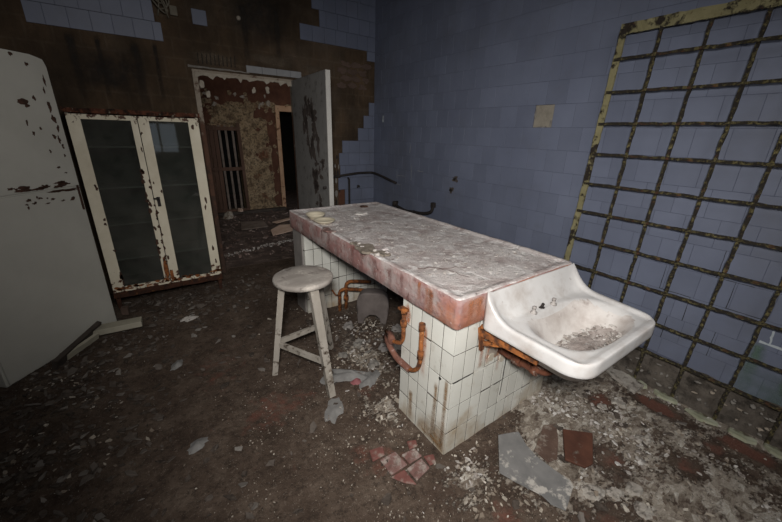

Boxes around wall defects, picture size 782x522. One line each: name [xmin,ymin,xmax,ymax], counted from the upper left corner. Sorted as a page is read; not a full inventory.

peeling [194,71,292,206]
peeling [533,105,555,127]